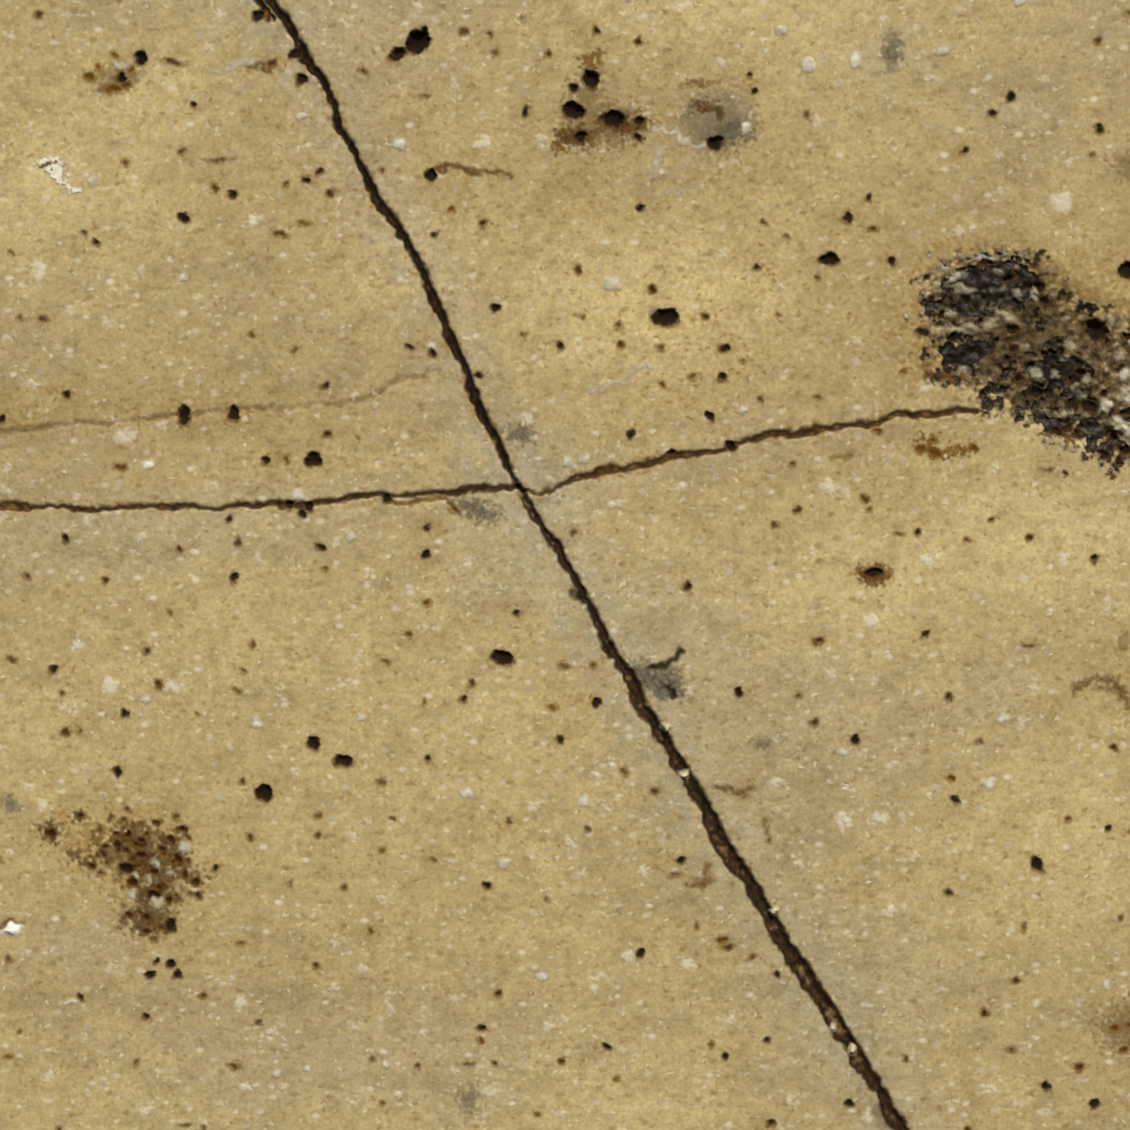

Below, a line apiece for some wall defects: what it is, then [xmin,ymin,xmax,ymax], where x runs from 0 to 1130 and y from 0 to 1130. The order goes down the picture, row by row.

crack [0,0,520,518]
crack [539,407,978,496]
spalling [903,234,1130,479]
crack [518,487,909,1130]